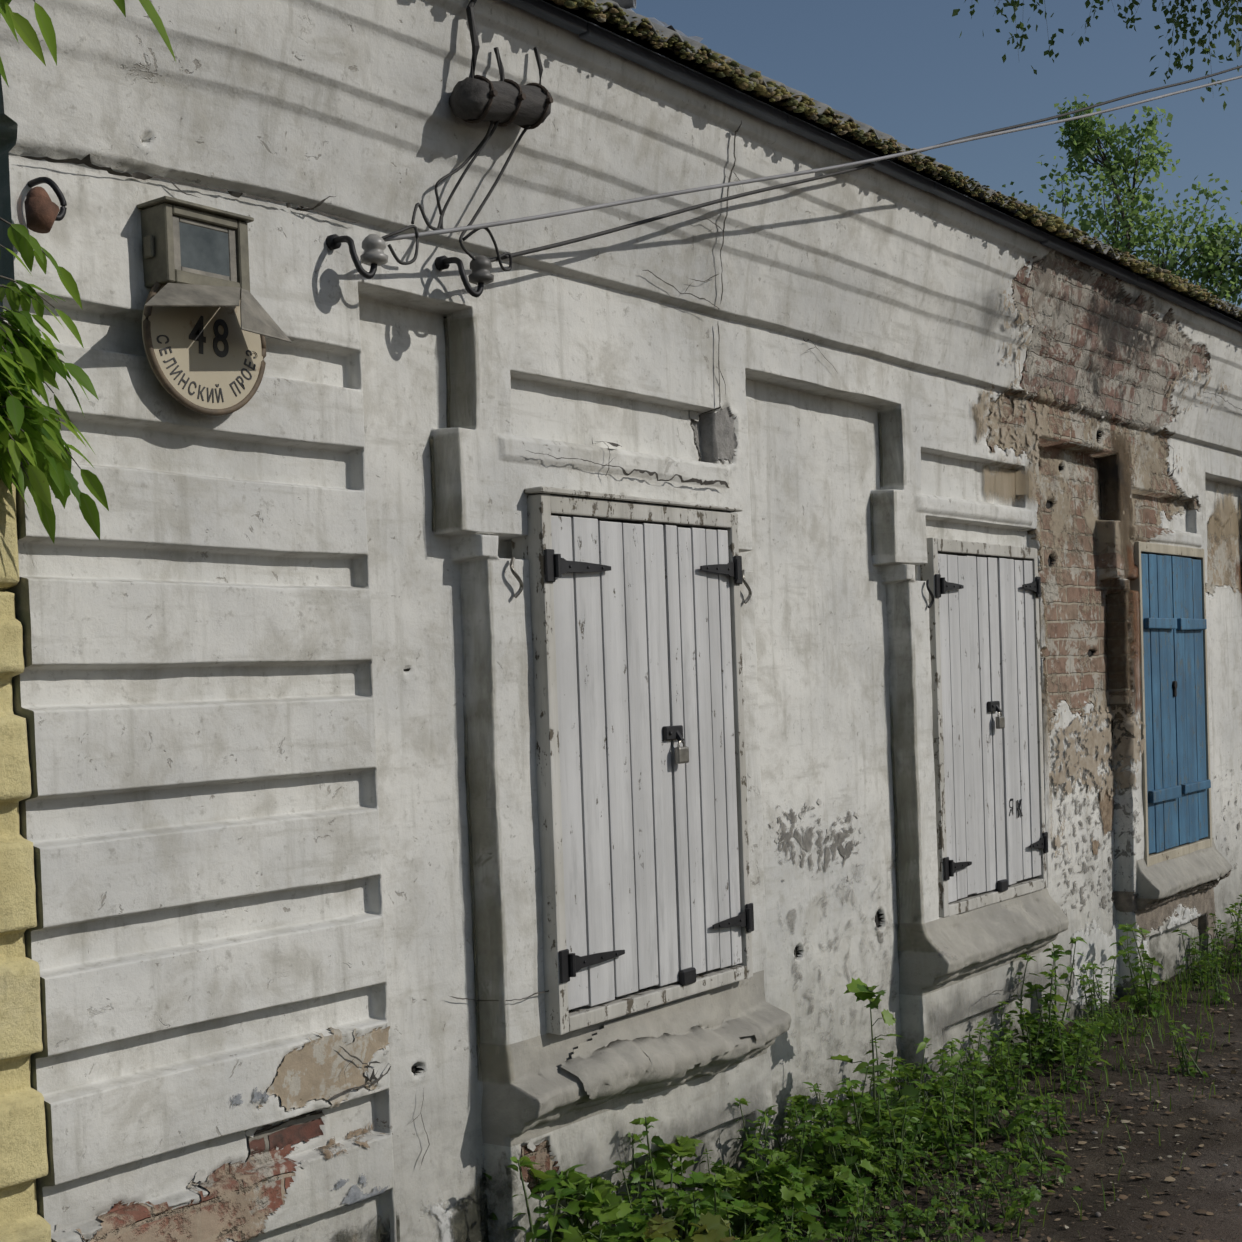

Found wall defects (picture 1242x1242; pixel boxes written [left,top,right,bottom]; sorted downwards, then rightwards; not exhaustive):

crack [20,154,356,223]
crack [643,120,744,414]
crack [526,441,729,488]
flaking render [689,407,738,464]
flaking render [969,249,1242,1010]
peeling [769,798,862,913]
flaking render [54,1026,394,1242]